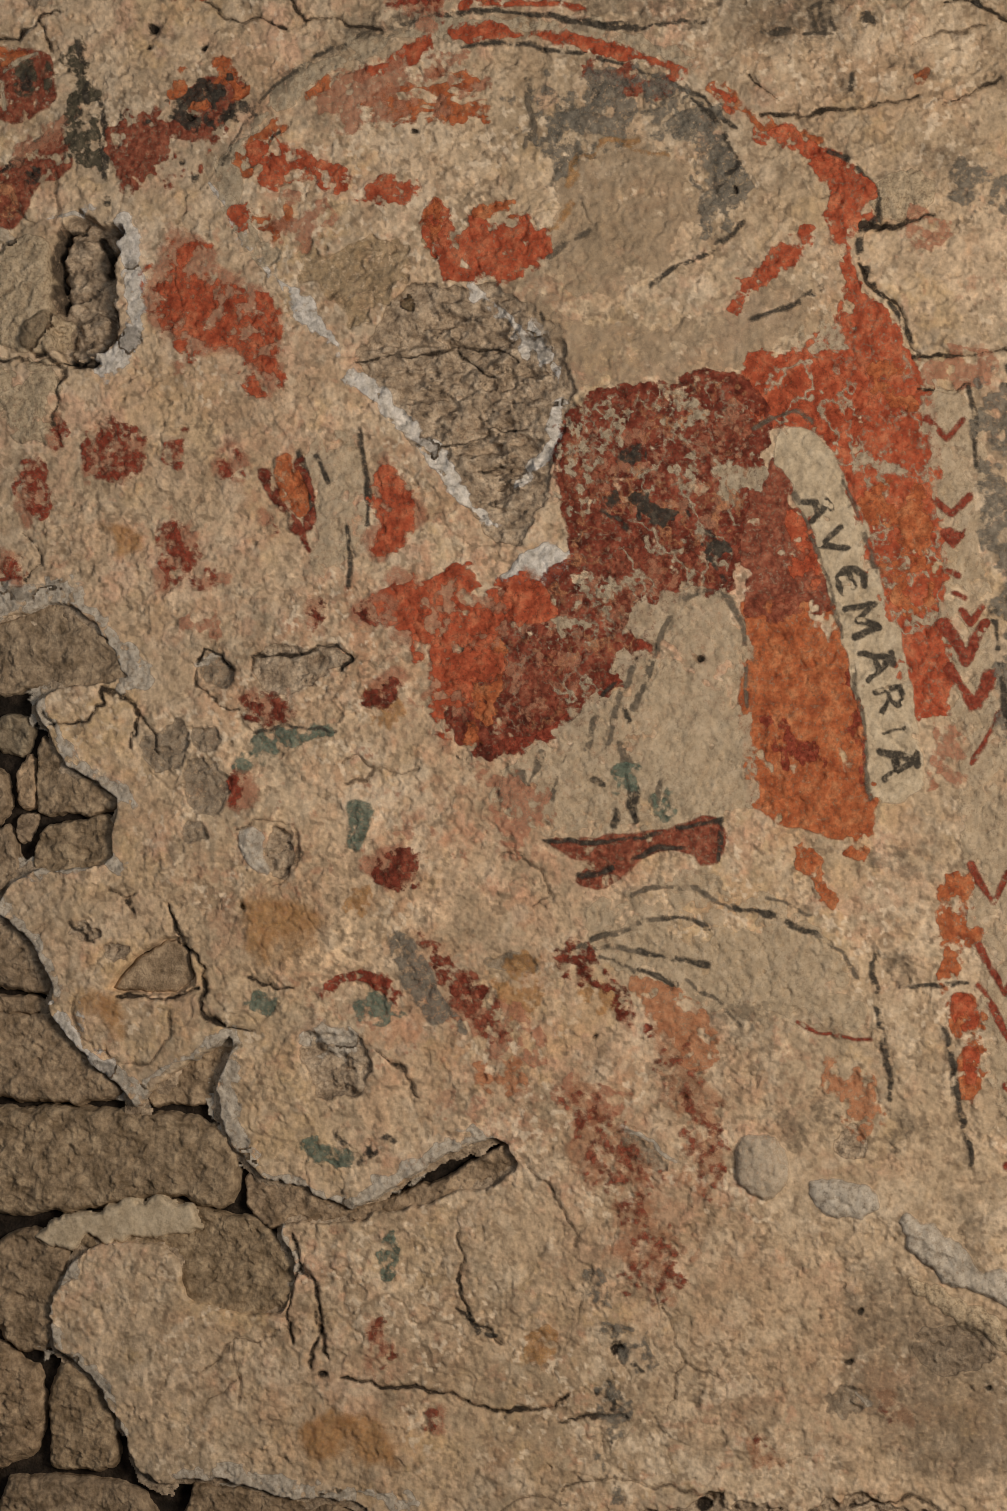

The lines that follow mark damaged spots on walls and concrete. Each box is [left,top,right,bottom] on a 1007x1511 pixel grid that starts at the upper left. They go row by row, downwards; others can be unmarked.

crack [0,10,60,51]
crack [205,0,382,31]
flaking render [48,182,576,546]
peeling [154,521,231,591]
flaking render [0,551,517,1511]
crack [206,1232,628,1423]